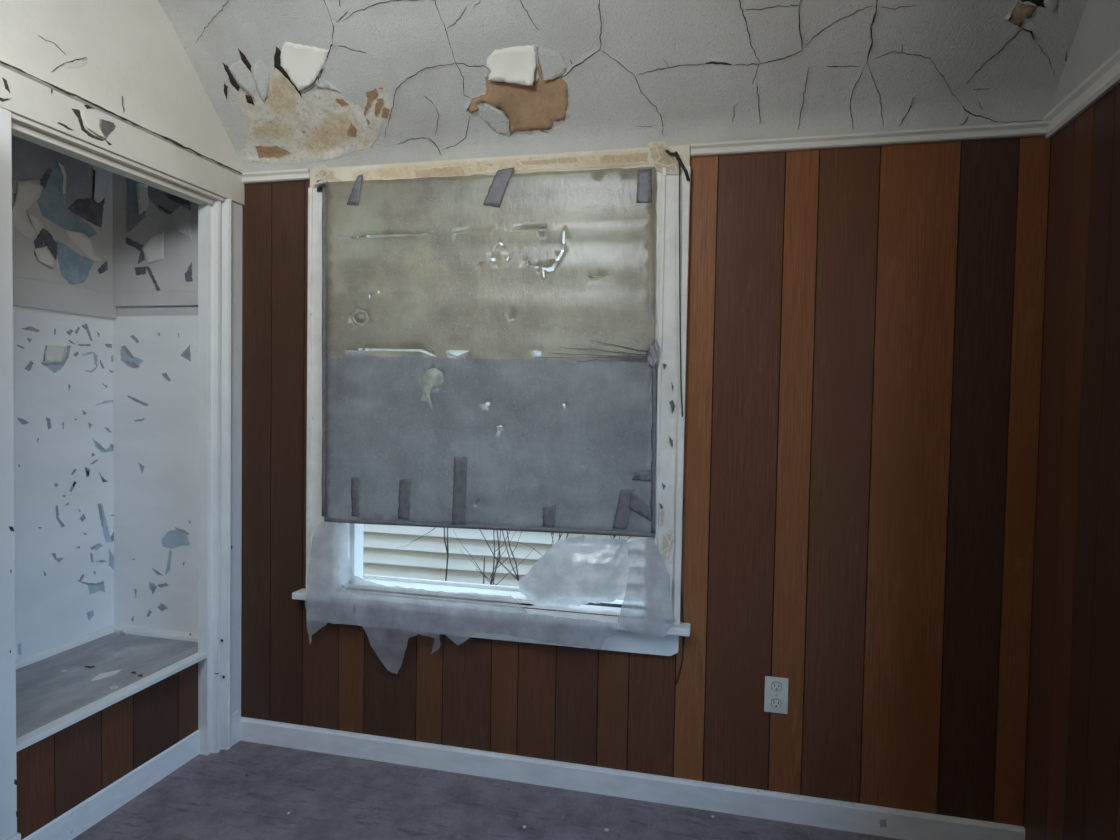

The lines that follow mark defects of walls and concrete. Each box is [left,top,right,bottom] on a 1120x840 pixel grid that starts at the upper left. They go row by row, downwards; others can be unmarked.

peeling [58,105,116,145]
crack [0,35,243,174]
crack [196,0,235,45]
crack [304,0,483,158]
peeling [462,45,572,138]
crack [562,0,1067,136]
peeling [1004,0,1059,31]
peeling [12,136,108,285]
peeling [126,177,193,291]
peeling [25,323,143,594]
peeling [131,520,191,621]